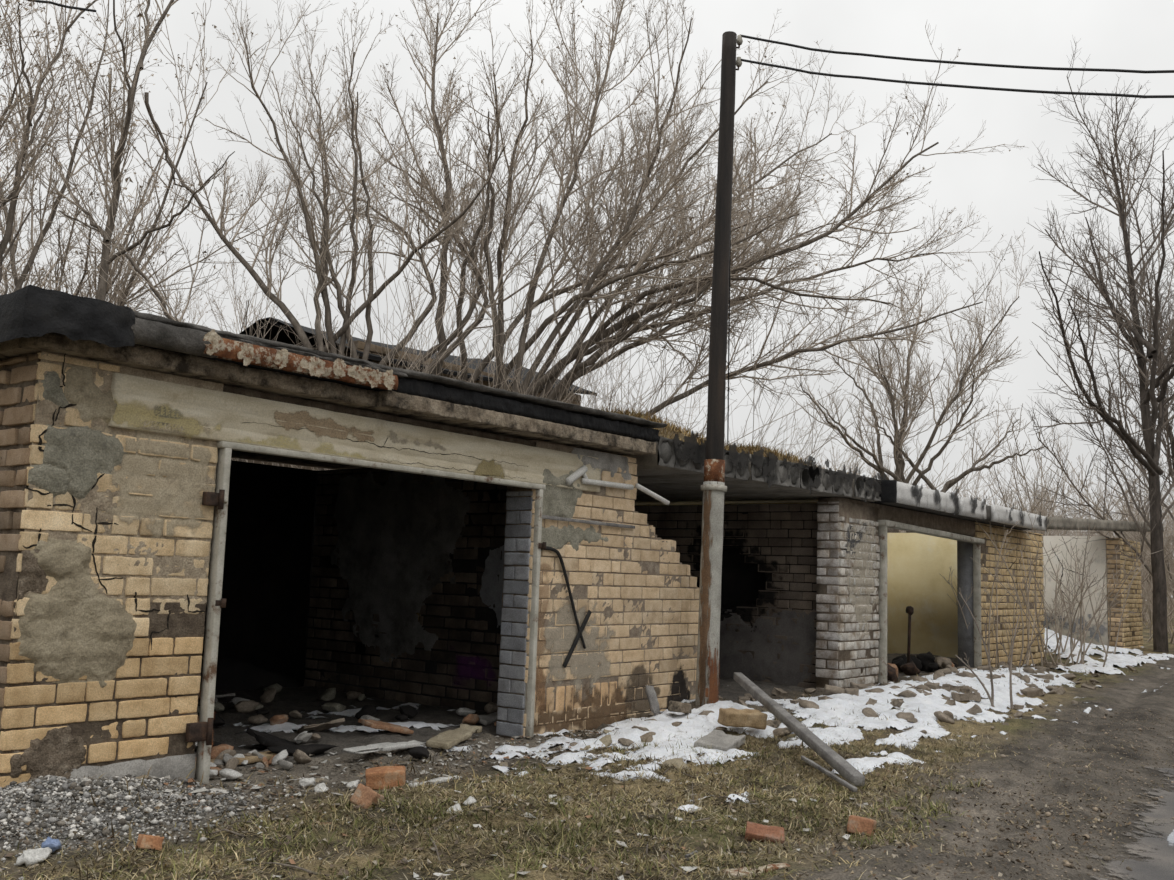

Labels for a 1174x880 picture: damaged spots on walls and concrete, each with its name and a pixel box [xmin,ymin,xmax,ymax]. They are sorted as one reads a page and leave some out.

peeling [274,411,374,442]
crack [23,474,123,594]
spalling [13,549,49,607]
spalling [9,723,87,781]